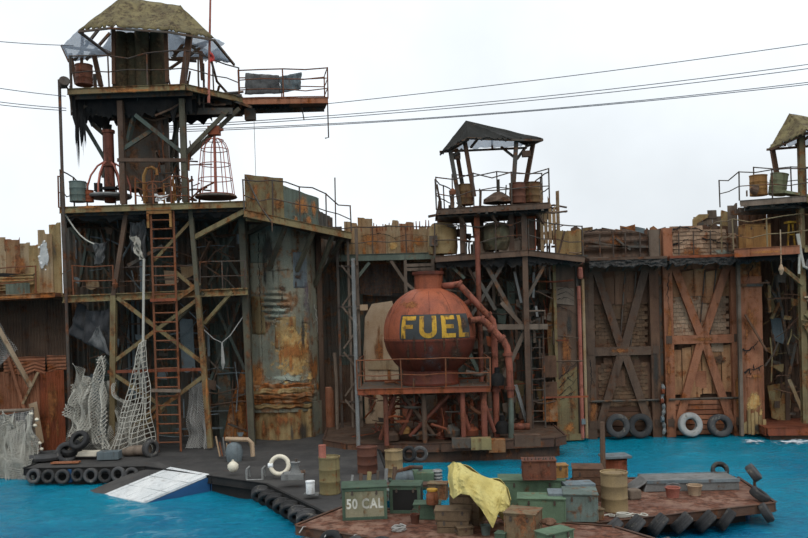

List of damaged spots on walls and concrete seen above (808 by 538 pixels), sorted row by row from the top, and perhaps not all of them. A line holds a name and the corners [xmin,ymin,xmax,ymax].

corrosion [269,326,319,409]